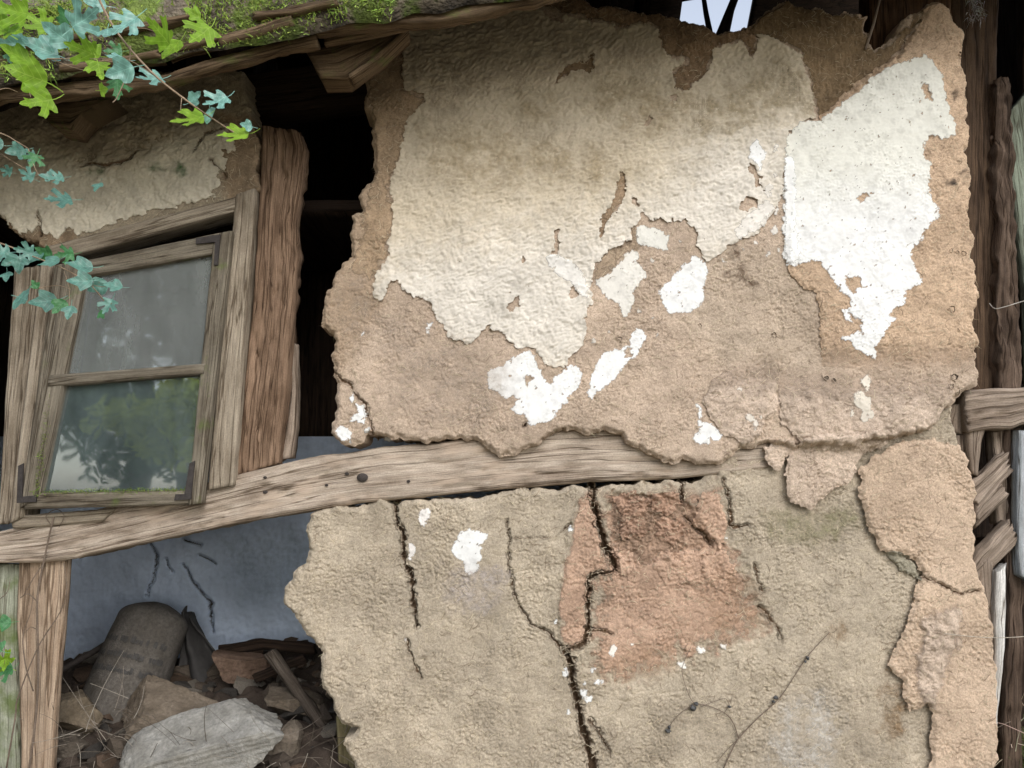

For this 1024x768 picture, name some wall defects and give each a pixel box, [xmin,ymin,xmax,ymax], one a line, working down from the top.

peeling [351,0,979,426]
peeling [335,394,370,443]
peeling [693,404,723,445]
crack [145,539,216,633]
crack [392,499,423,681]
crack [505,482,620,768]
flaking render [554,488,759,703]
crack [753,562,783,641]